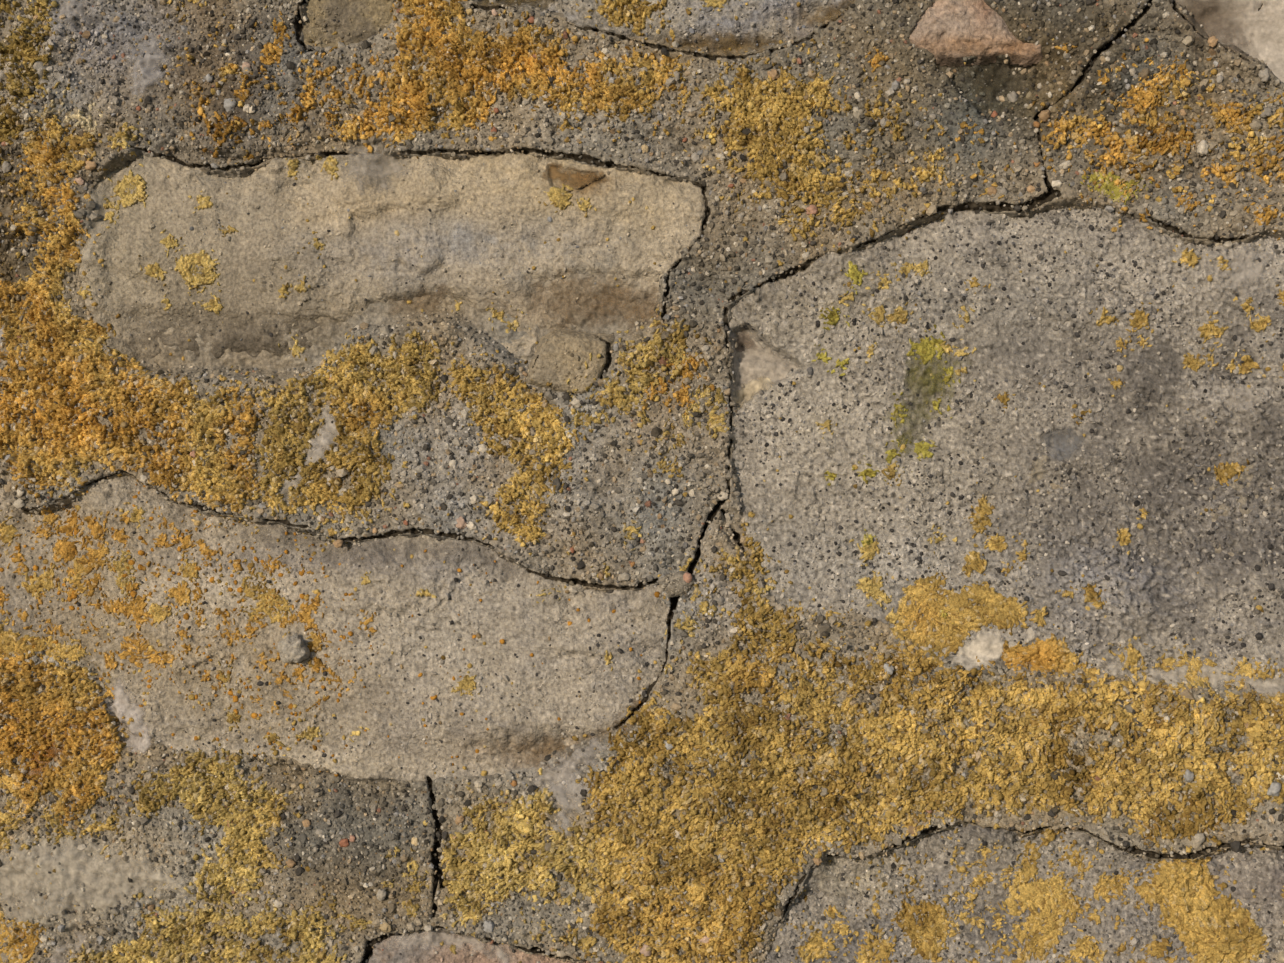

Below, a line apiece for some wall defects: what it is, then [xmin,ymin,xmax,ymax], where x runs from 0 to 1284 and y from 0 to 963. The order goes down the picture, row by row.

crack [856,0,1265,248]
crack [21,255,823,729]
crack [361,933,402,963]
crack [427,776,587,961]